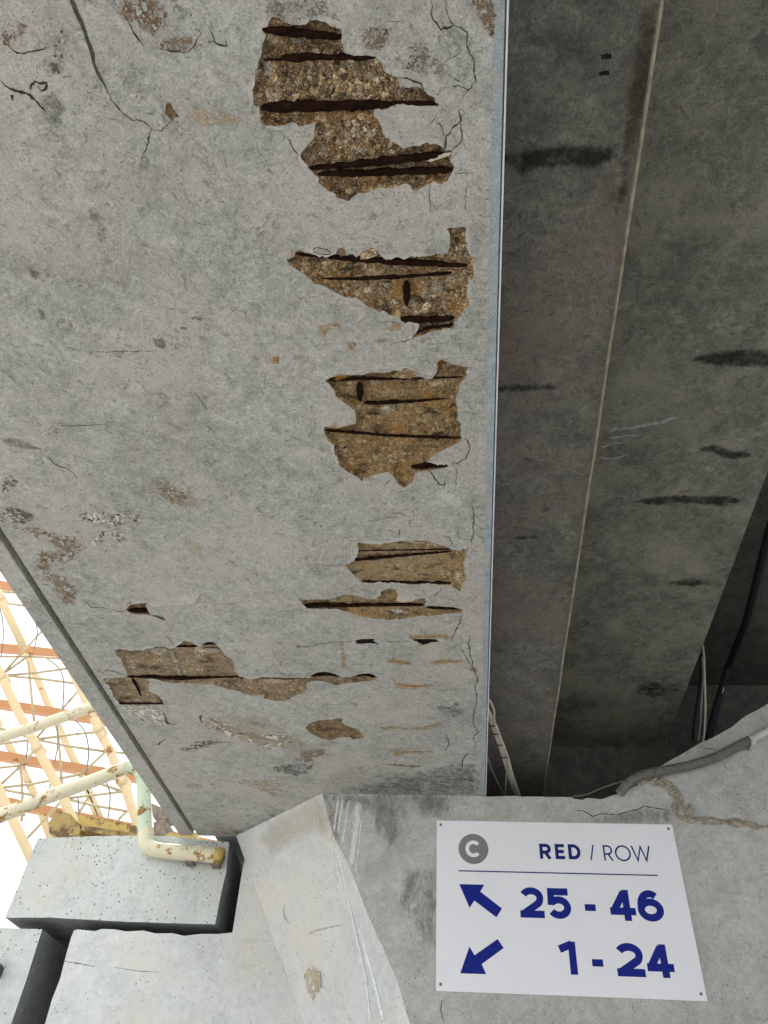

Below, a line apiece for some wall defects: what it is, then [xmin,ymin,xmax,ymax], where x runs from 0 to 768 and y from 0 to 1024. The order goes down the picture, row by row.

crack [70,0,171,159]
spalling [247,0,455,203]
crack [399,0,477,208]
spalling [287,227,476,338]
spalling [324,359,470,490]
spalling [300,537,472,621]
spalling [103,641,378,725]
spalling [181,716,364,796]
crack [574,806,668,817]